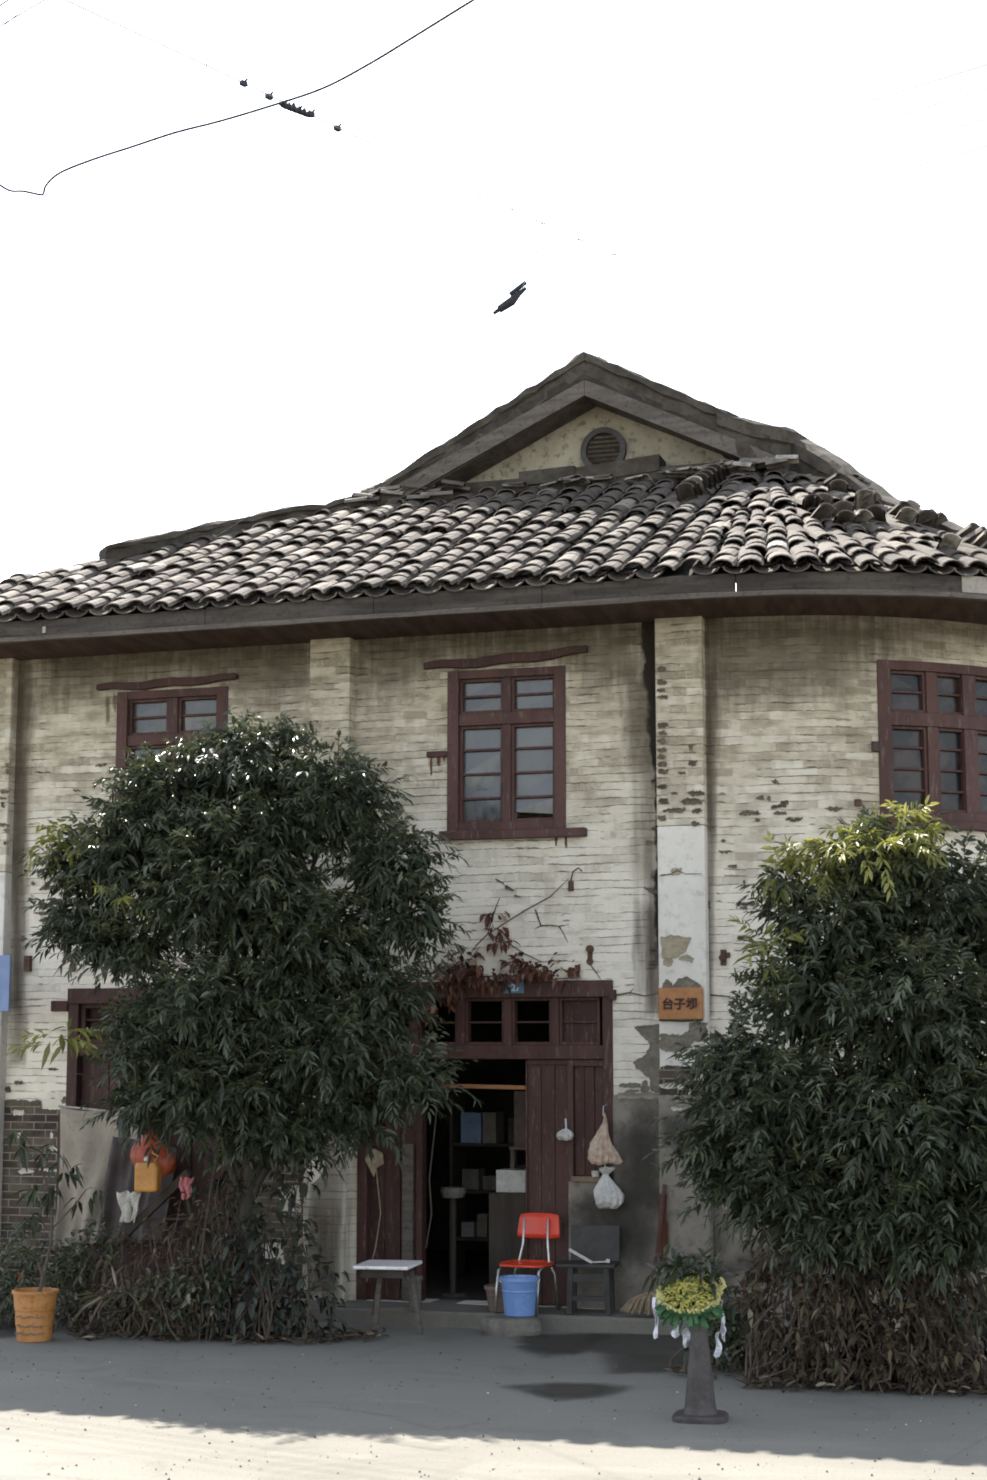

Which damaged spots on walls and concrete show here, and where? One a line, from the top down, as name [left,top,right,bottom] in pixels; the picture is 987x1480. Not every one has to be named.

spalling [0,763,11,845]
spalling [739,779,803,822]
peeling [660,935,701,988]
spalling [616,1021,722,1112]
leakage [581,1114,699,1260]